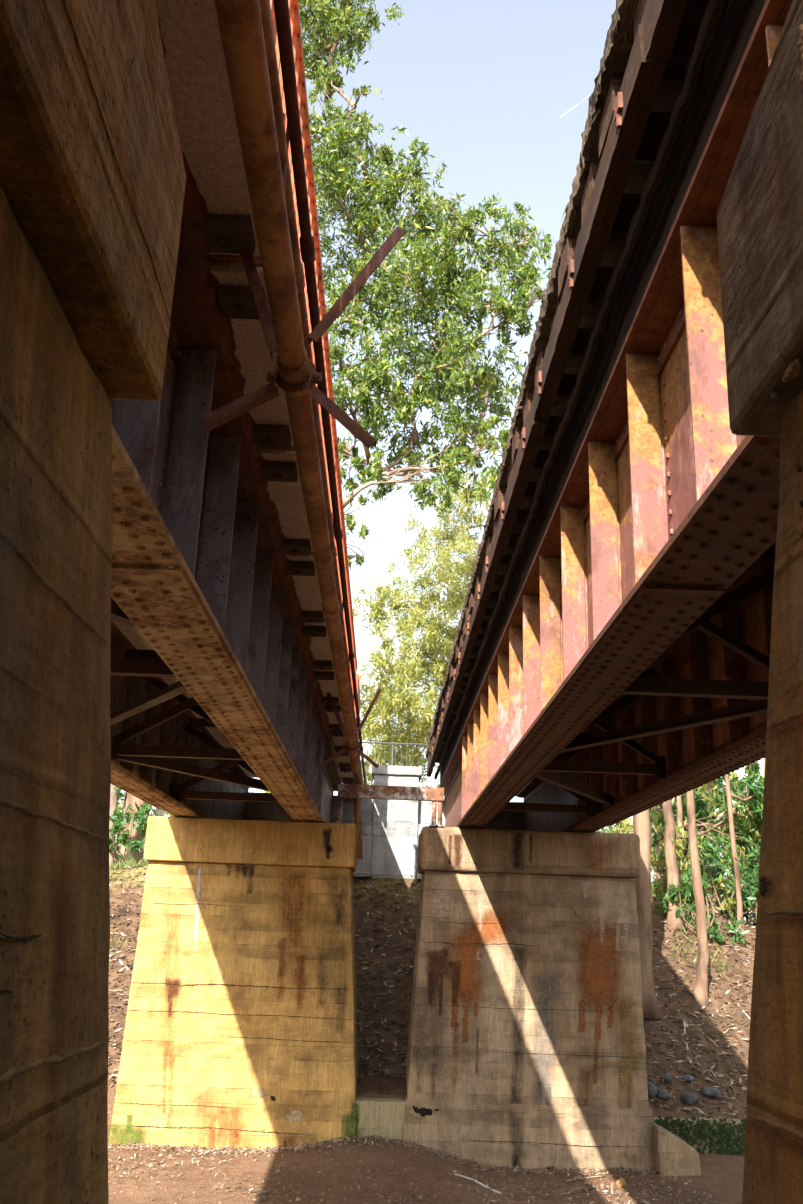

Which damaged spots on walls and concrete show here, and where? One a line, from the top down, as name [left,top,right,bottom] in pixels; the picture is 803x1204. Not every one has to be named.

rust [166,980,180,1016]
rust [279,874,305,1005]
rust [428,912,508,1072]
rust [578,928,634,1107]